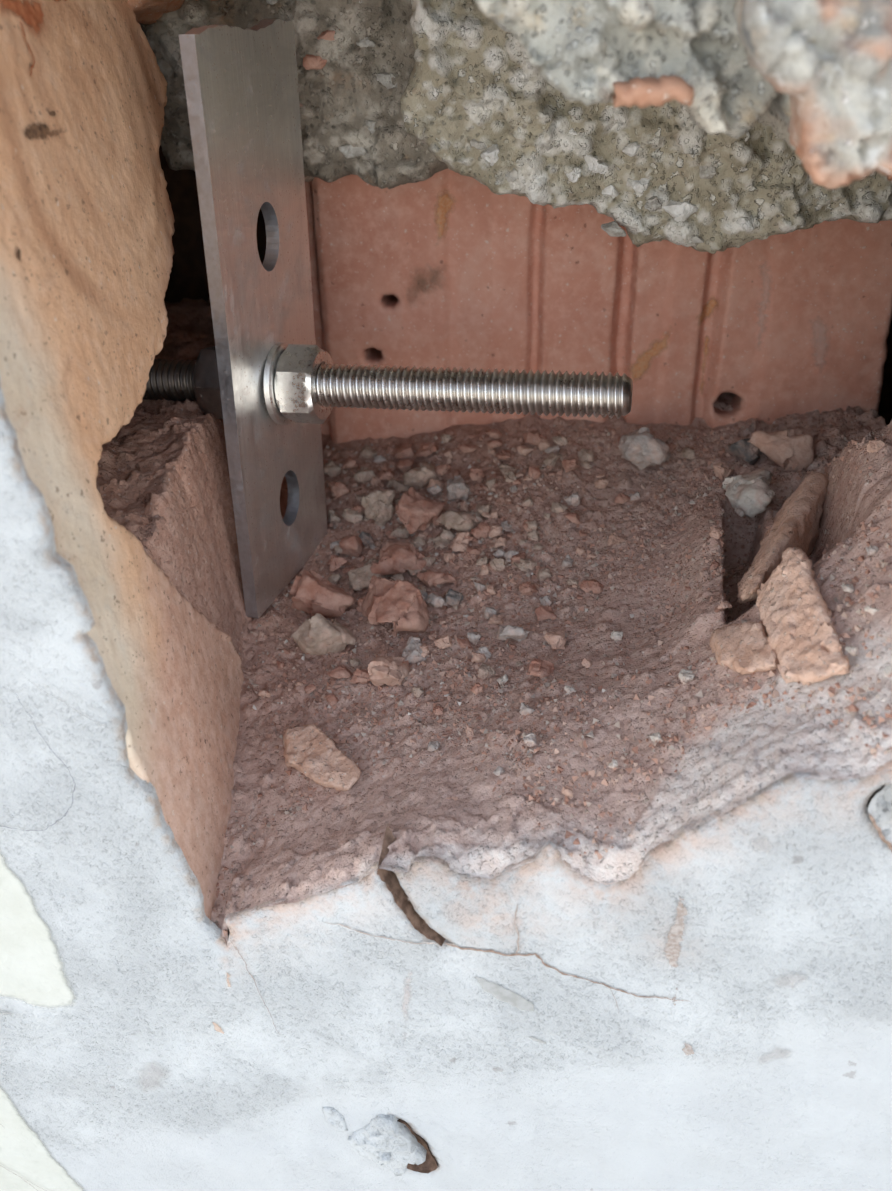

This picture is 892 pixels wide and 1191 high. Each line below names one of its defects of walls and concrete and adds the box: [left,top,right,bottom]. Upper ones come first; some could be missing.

spalling [867,784,892,844]
crack [324,823,692,1008]
spalling [322,1107,438,1176]